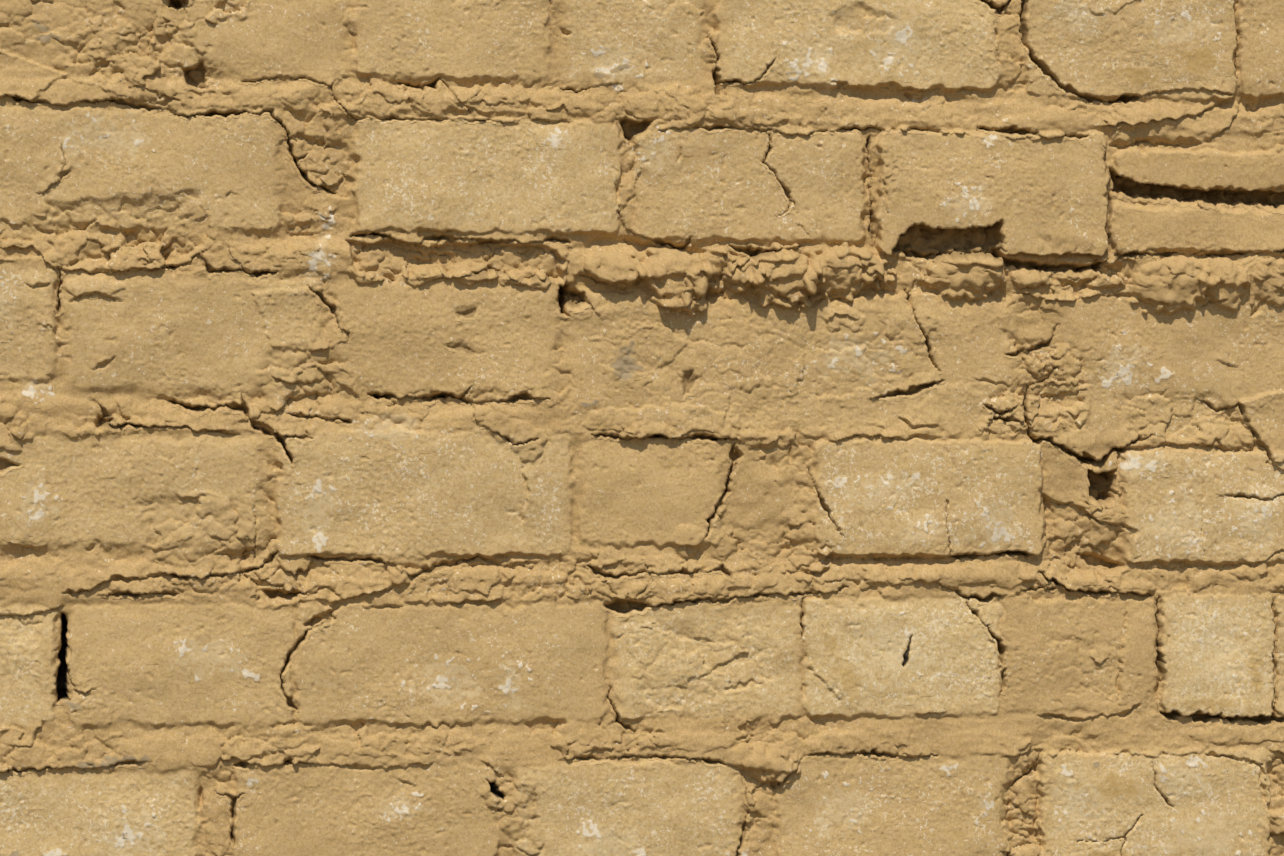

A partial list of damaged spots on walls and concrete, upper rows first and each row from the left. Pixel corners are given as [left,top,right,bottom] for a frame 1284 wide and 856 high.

crack [1016,0,1143,107]
crack [760,130,800,219]
crack [584,442,738,599]
spalling [804,395,1284,585]
crack [159,550,337,712]
spalling [901,635,913,667]
peeling [1156,579,1283,716]